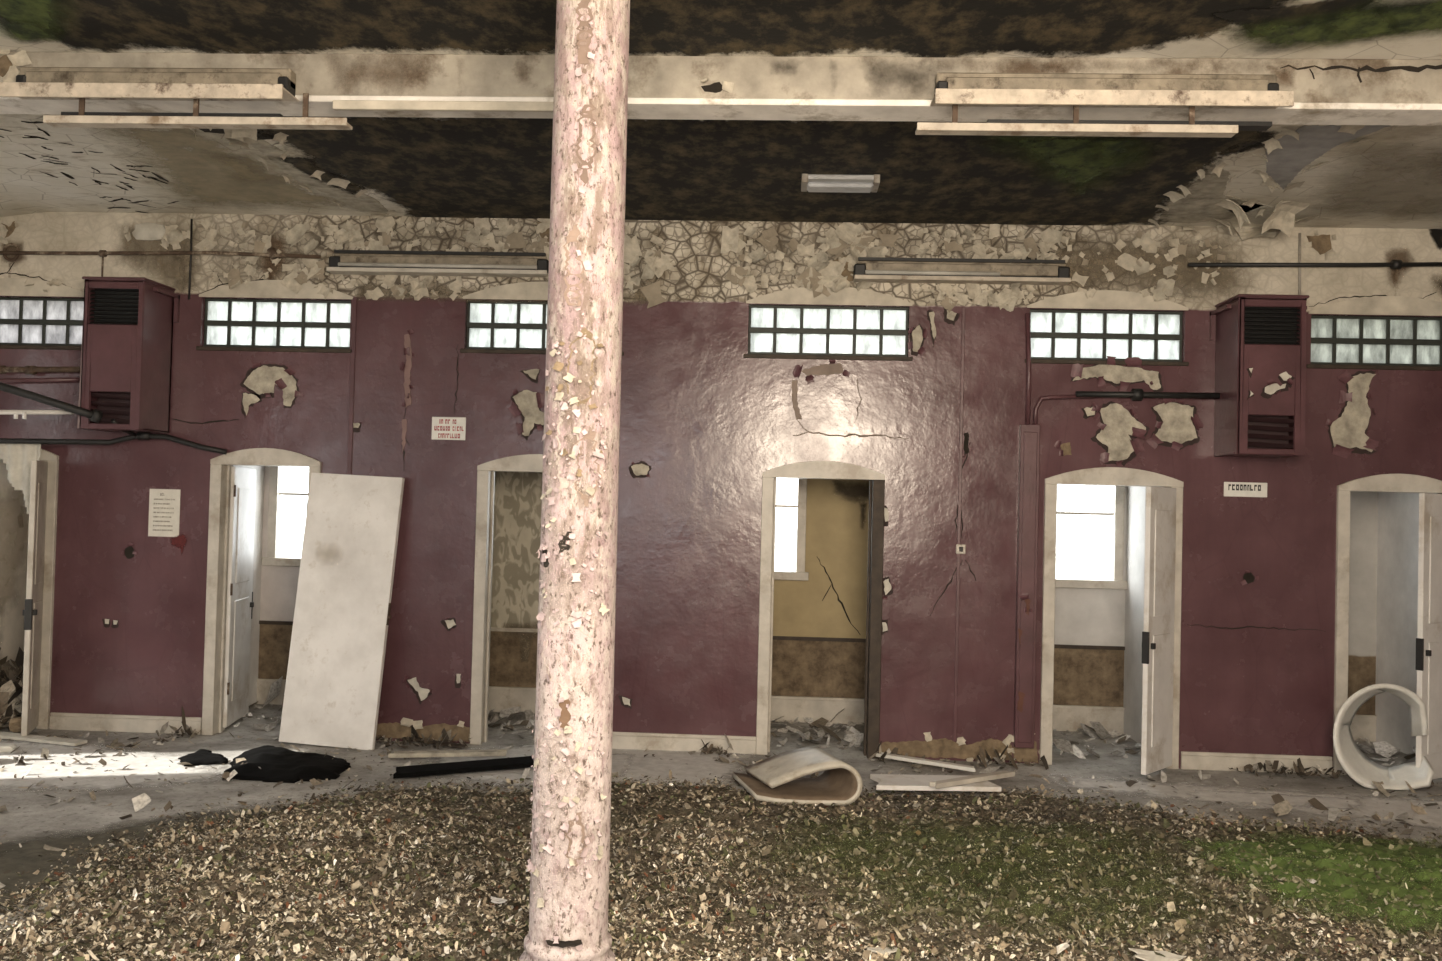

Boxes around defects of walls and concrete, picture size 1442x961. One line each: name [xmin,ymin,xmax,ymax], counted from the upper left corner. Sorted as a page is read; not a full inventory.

spalling [701,78,734,93]
leakage [117,116,553,219]
peeling [571,99,601,194]
peeling [623,222,675,308]
peeling [721,222,899,298]
leakage [625,119,1277,226]
peeling [916,125,1399,301]
peeling [1070,356,1204,467]
peeling [1246,367,1295,401]
peeling [1325,370,1379,458]
leakage [0,499,28,600]
peeling [190,129,610,912]